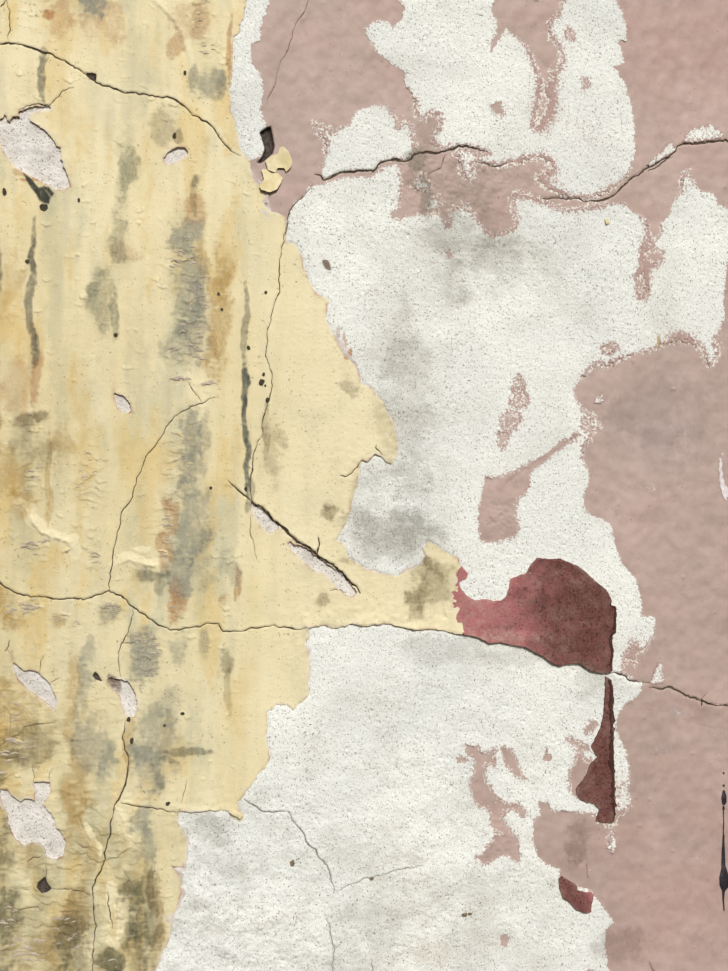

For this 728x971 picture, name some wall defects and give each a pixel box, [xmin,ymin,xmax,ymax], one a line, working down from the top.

spalling [0,106,70,190]
crack [543,139,728,202]
crack [229,145,505,593]
crack [0,382,308,676]
leakage [241,367,270,491]
peeling [157,0,728,971]
crack [508,434,578,481]
crack [609,672,728,706]
crack [244,799,419,891]
crack [326,917,341,971]